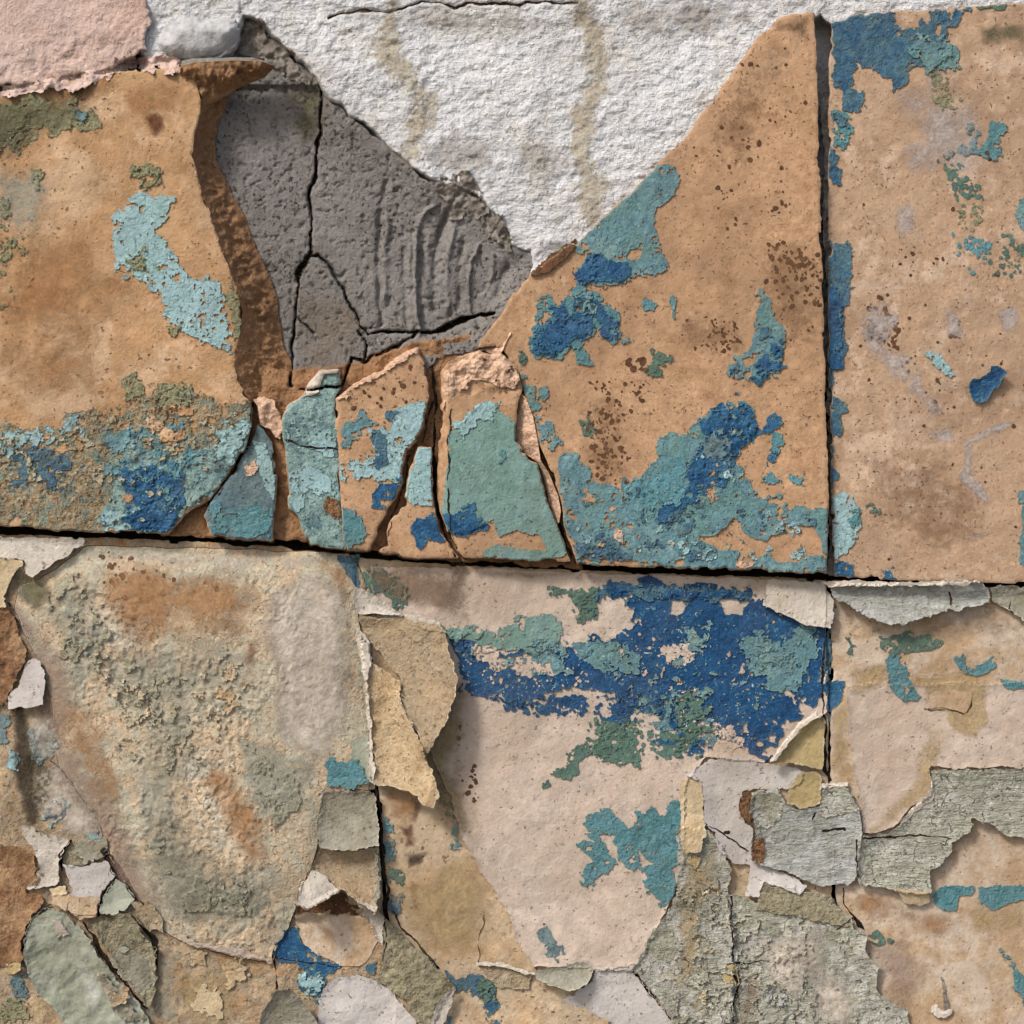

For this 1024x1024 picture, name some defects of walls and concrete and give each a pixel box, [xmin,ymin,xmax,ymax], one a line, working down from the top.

crack [327,1,578,19]
crack [289,91,496,391]
flaking render [0,18,827,573]
peeling [694,239,853,436]
peeling [0,536,85,771]
spalling [99,551,176,608]
peeling [46,572,254,773]
crack [559,522,576,564]
peeling [178,445,1024,1024]
crack [821,642,832,782]
peeling [0,798,163,1024]
crack [374,785,440,969]